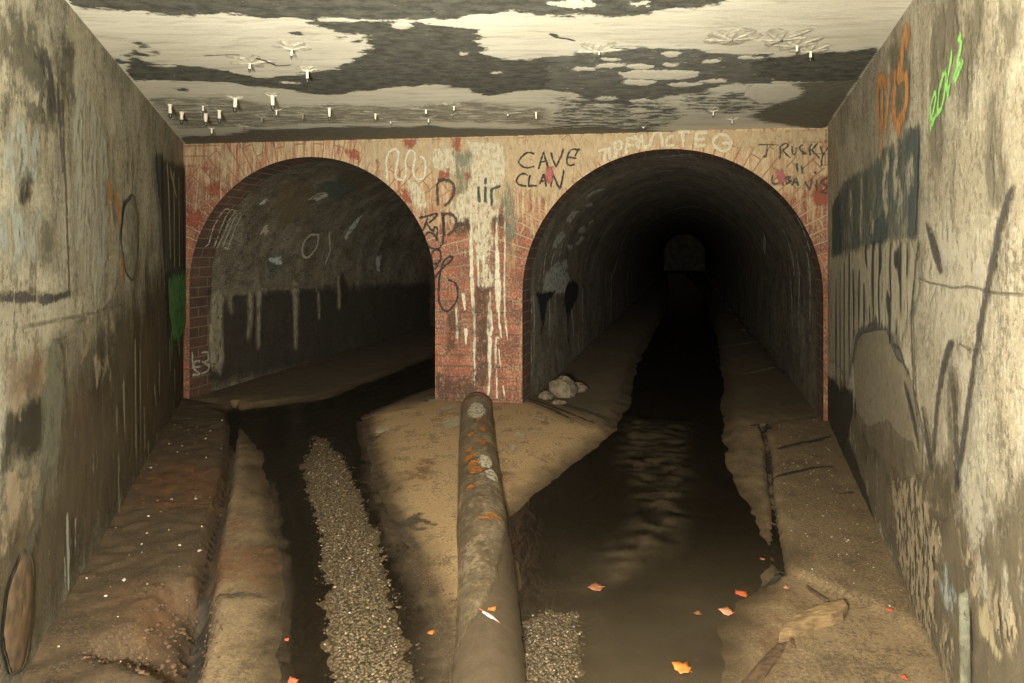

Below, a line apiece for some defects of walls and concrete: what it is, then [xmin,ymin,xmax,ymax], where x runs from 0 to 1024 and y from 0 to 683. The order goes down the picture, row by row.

peeling [69,0,879,130]
damp [182,79,858,398]